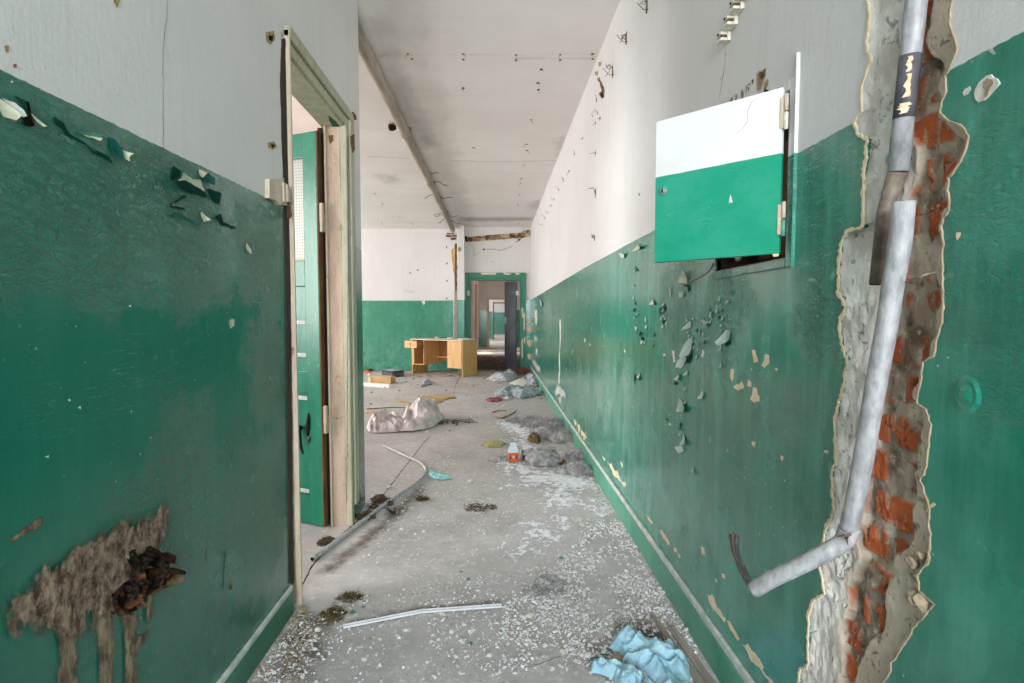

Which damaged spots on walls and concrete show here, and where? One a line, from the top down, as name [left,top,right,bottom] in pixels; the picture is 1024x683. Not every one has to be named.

spalling [963,74,1001,103]
peeling [0,96,134,165]
peeling [170,166,236,229]
peeling [632,266,760,454]
peeling [752,350,778,371]
flaking render [796,0,970,683]
spalling [111,546,176,617]
peeling [708,595,774,683]